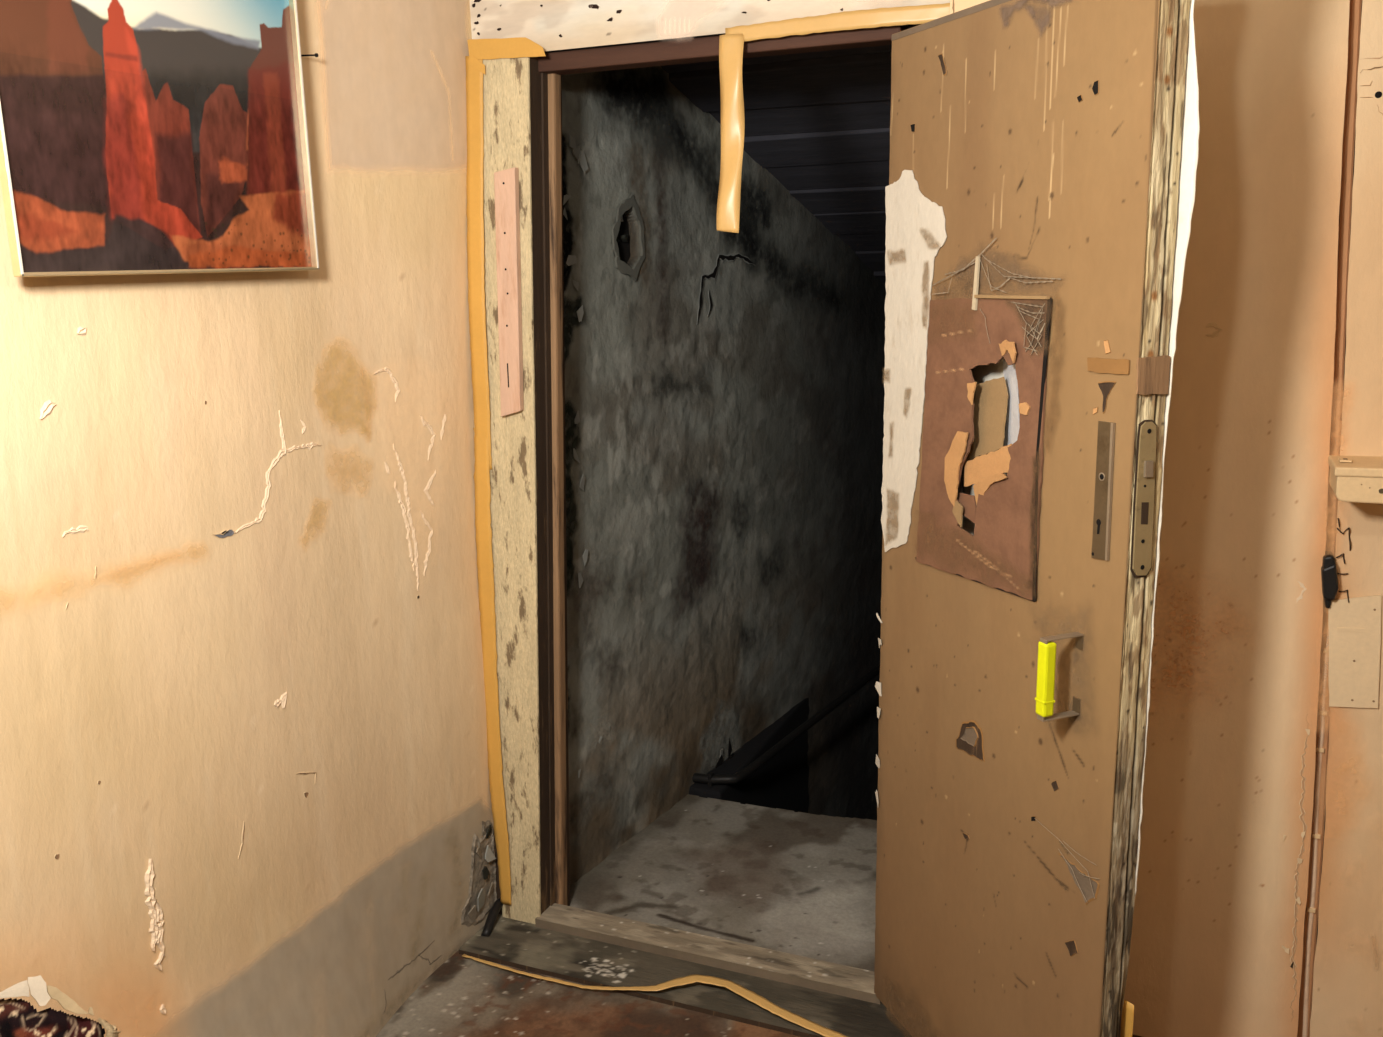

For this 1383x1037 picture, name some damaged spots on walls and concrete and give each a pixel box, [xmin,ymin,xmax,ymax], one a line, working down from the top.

crack [1359,56,1383,116]
leakage [316,346,375,435]